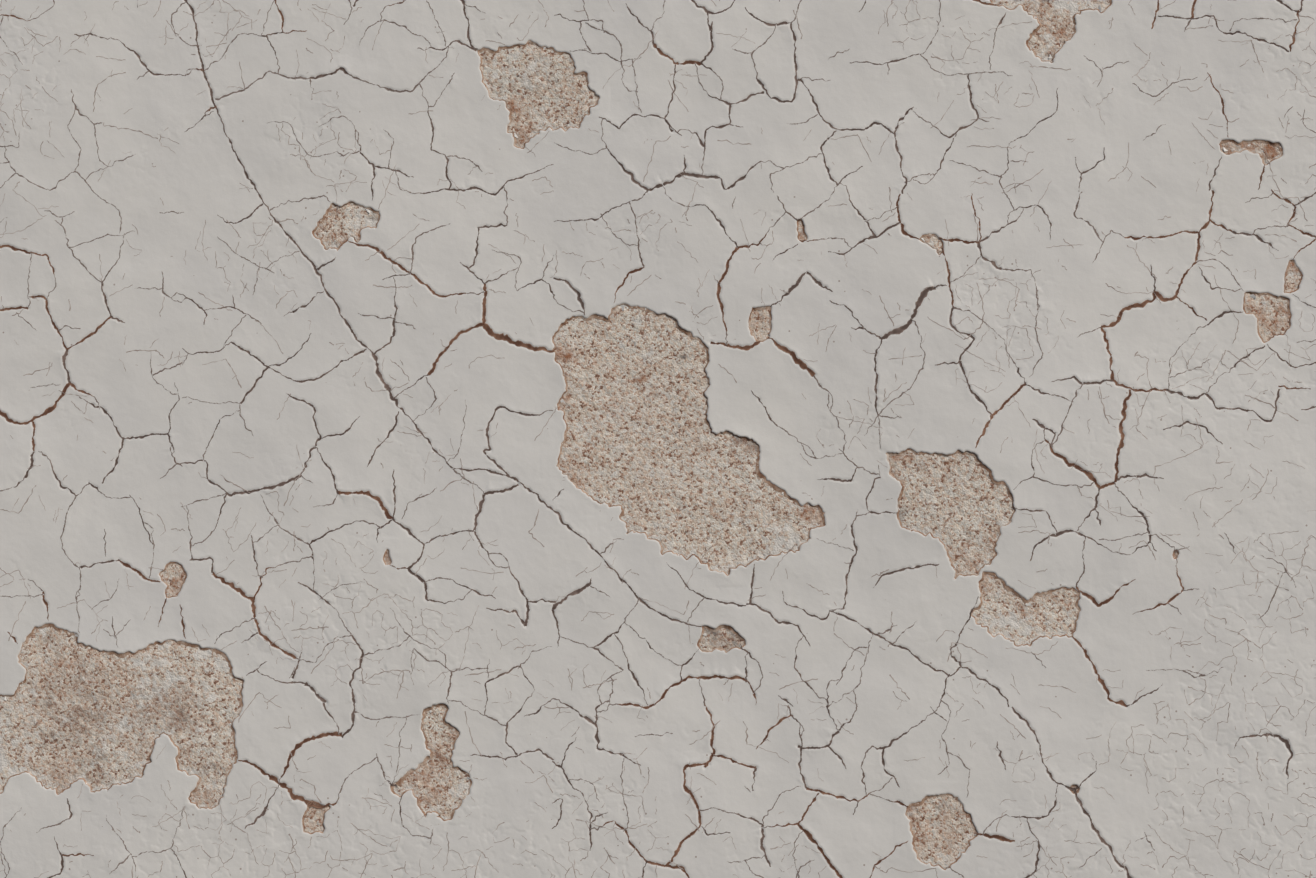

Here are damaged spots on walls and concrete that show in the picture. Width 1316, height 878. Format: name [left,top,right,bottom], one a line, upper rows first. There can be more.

peeling [477,40,600,149]
crack [515,246,585,315]
crack [761,271,833,306]
peeling [552,303,826,576]
crack [0,568,49,644]
crack [872,564,939,588]
peeling [886,448,1081,646]
peeling [0,623,244,809]
peeling [390,703,472,821]
crack [1072,636,1163,707]
crack [1118,532,1316,794]
peeling [905,794,978,870]